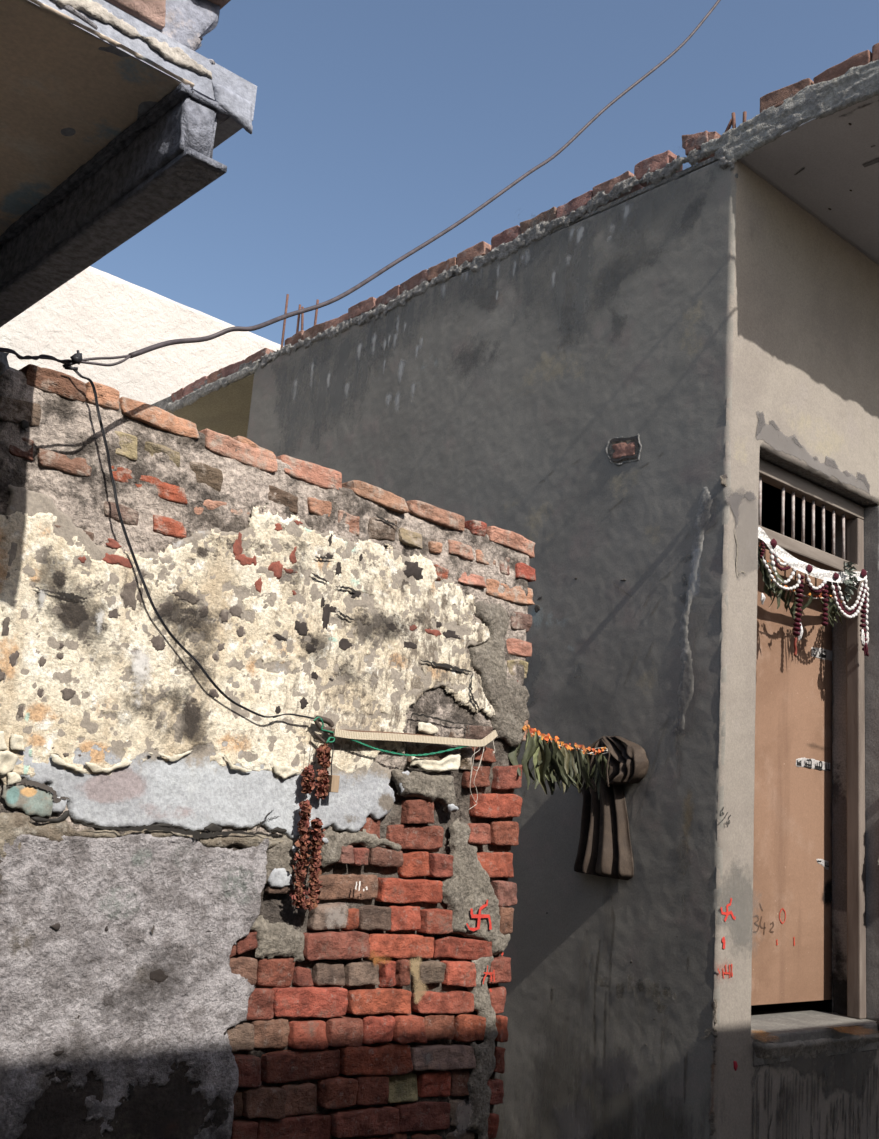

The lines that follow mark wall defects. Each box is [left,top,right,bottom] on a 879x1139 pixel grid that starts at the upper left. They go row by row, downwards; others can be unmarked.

water stain [275,215,594,456]
spalling [102,538,147,619]
spalling [233,532,297,593]
spalling [403,561,423,580]
spalling [273,621,317,654]
spalling [321,596,337,629]
spalling [389,622,461,649]
spalling [0,731,71,823]
flaking render [399,754,461,793]
flaking render [268,868,293,888]
water stain [494,911,692,1139]
water stain [752,1046,879,1139]